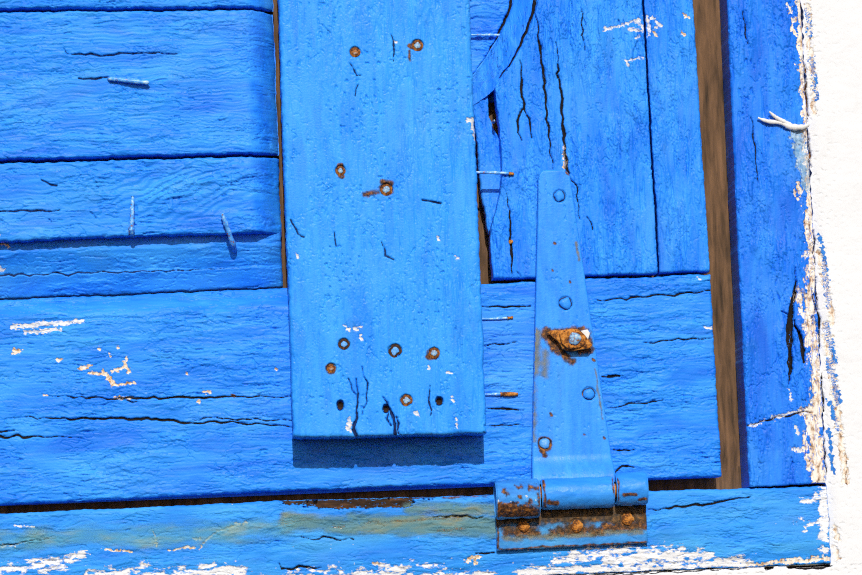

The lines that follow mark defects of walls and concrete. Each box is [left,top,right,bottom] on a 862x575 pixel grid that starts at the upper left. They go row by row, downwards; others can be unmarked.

crack [473,0,593,230]
rust [363,179,393,197]
peeling [512,0,850,575]
peeling [10,318,84,335]
peeling [77,346,137,400]
rust [534,326,597,376]
crack [747,230,824,426]
crack [0,395,291,439]
rust [496,478,647,550]
peeling [0,550,91,575]
peeling [84,561,247,575]
peeling [286,555,497,575]